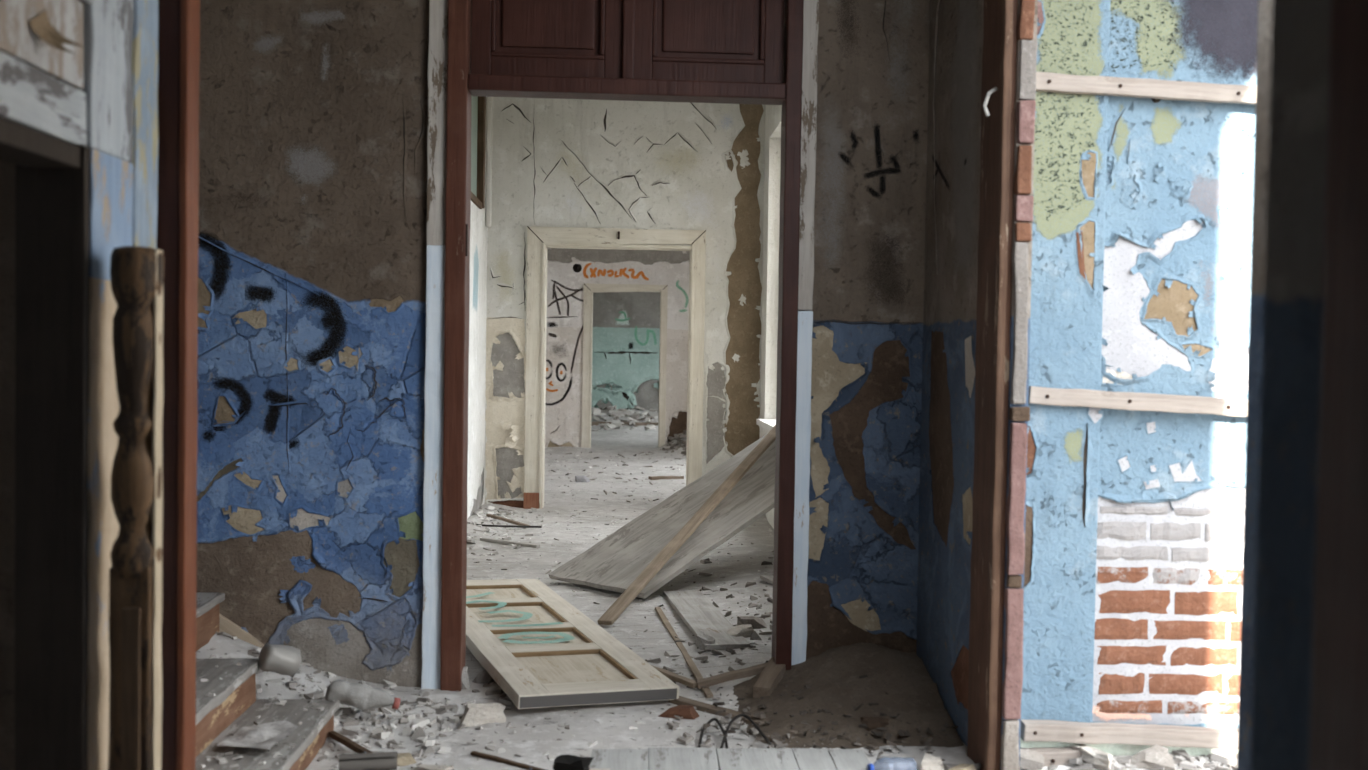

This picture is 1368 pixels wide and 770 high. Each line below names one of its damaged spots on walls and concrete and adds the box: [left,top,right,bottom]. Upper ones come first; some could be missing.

peeling [28,10,84,54]
peeling [1036,0,1186,79]
peeling [198,273,270,331]
peeling [197,414,425,687]
peeling [281,343,365,377]
crack [488,99,717,319]
peeling [592,104,765,469]
peeling [806,323,975,659]
peeling [1027,424,1041,478]
peeling [1064,407,1103,464]
peeling [1033,91,1249,398]
spalling [1092,458,1245,728]